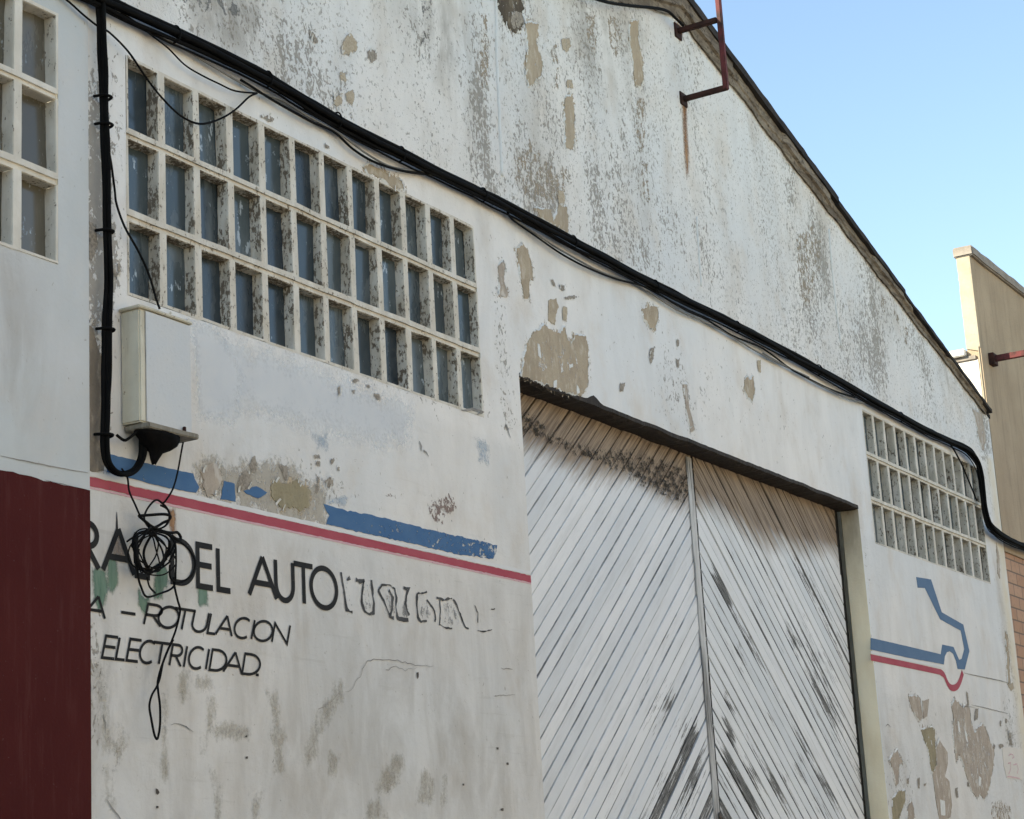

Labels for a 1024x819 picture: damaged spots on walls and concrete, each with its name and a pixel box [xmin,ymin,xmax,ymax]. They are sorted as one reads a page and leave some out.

peeling [341,33,377,63]
peeling [493,0,544,88]
peeling [628,17,644,88]
peeling [562,79,577,150]
peeling [497,241,535,302]
peeling [519,279,591,397]
peeling [641,301,659,333]
peeling [237,456,257,492]
peeling [265,455,340,520]
water stain [521,412,688,502]
crack [319,659,432,709]
peeling [888,691,1013,819]